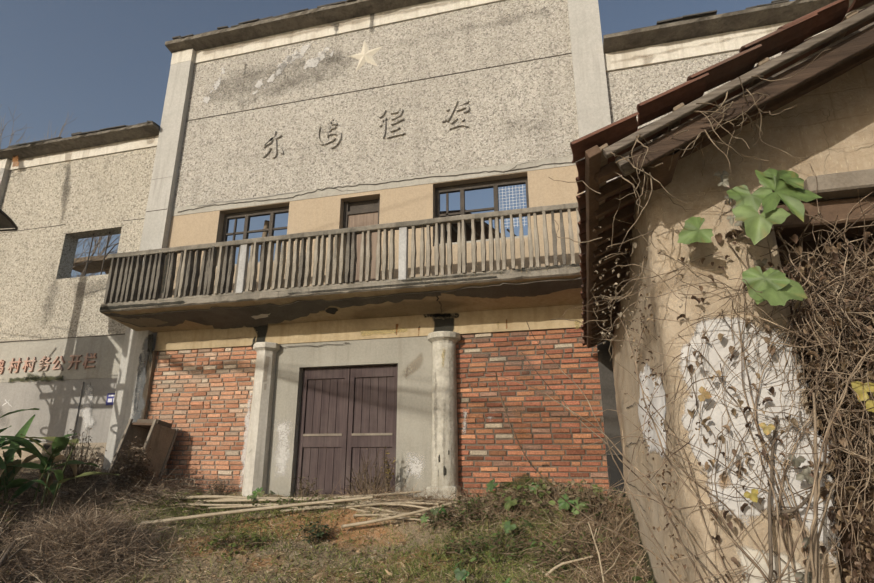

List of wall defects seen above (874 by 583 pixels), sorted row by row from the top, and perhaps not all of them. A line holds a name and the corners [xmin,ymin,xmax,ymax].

peeling [103,277,583,329]
peeling [638,363,667,457]
peeling [680,317,837,563]
peeling [737,546,805,583]